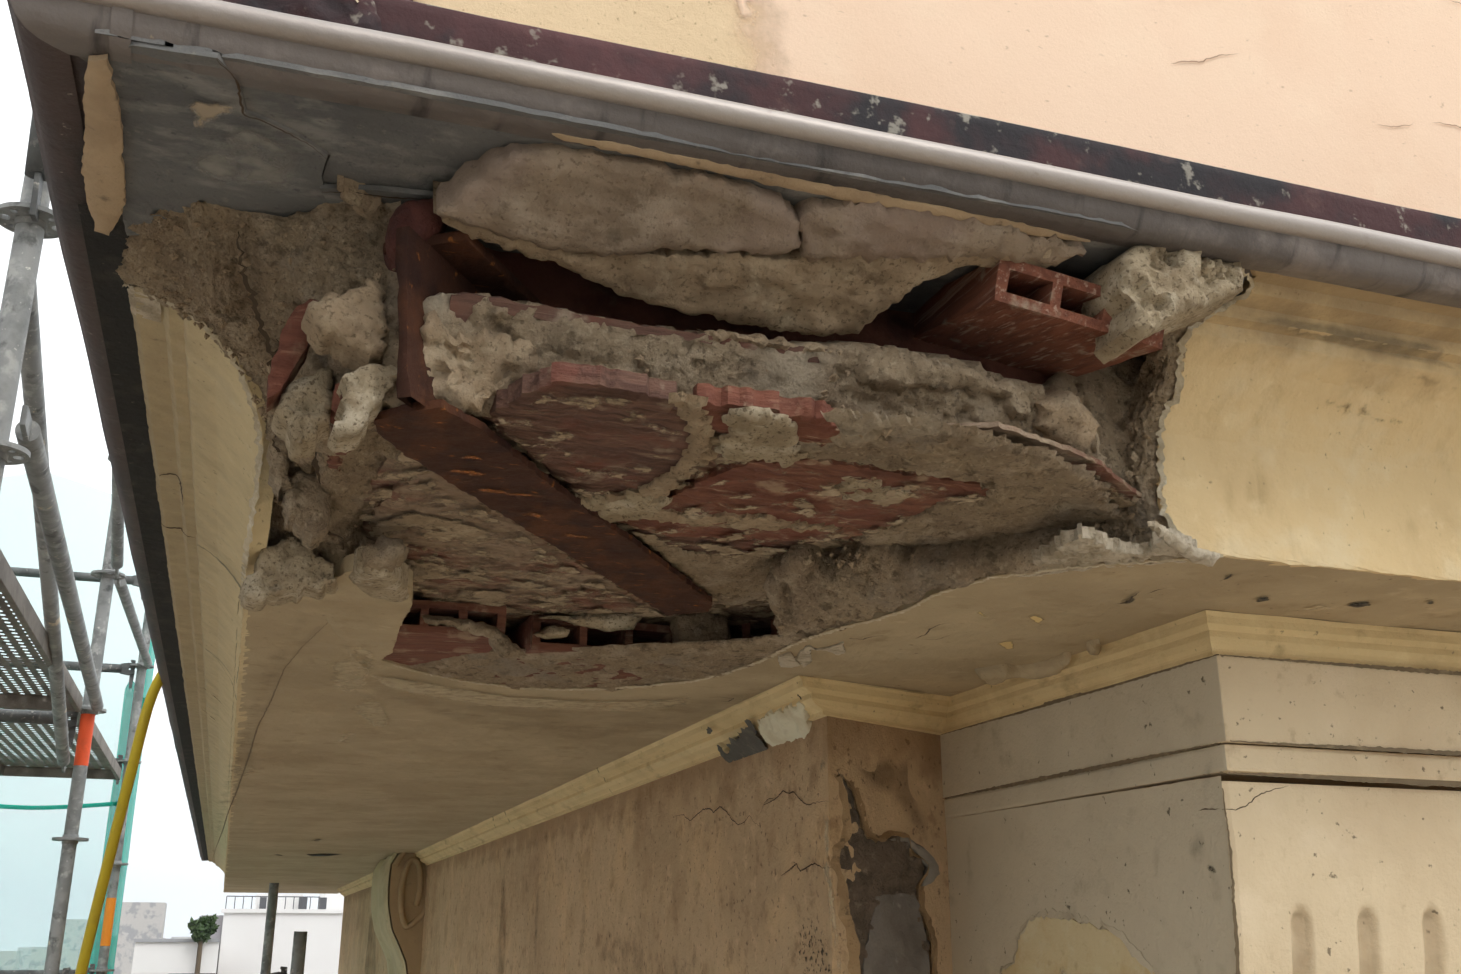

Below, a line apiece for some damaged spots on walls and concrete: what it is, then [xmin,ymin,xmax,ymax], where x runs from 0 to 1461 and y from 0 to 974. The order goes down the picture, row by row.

spalling [115,143,1244,692]
spalling [1305,602,1371,610]
peeling [706,719,768,763]
crack [677,790,823,826]
crack [781,862,831,876]
spalling [827,772,940,974]
peeling [999,908,1163,974]